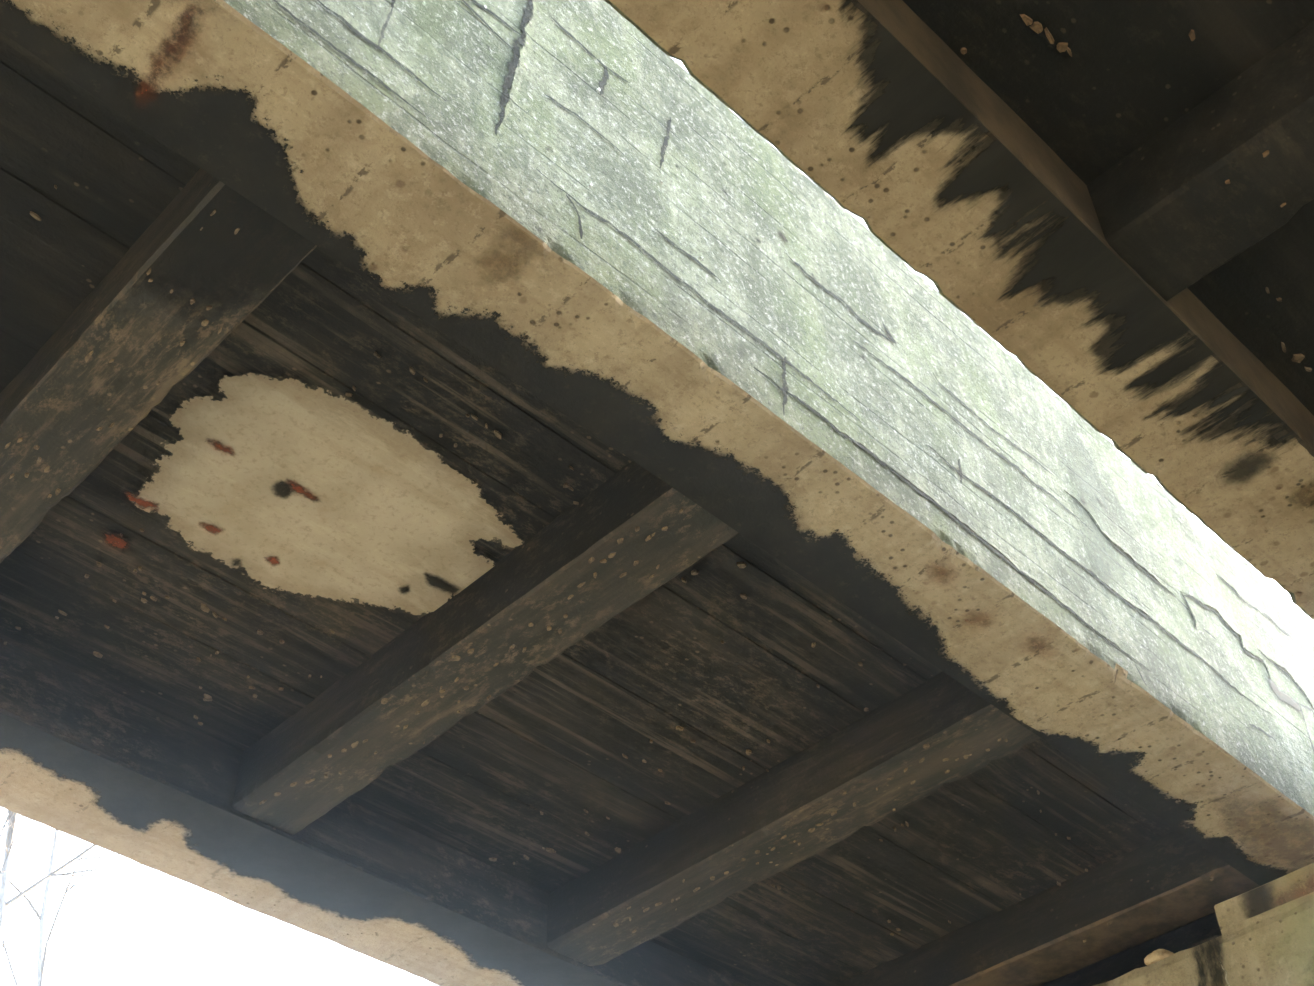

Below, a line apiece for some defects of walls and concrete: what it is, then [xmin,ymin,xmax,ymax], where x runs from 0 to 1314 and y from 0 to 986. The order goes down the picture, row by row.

corrosion [135,8,202,102]
crack [274,0,447,117]
crack [462,0,630,155]
crack [660,117,671,168]
peeling [126,372,525,615]
crack [537,169,1314,752]
damp [1226,453,1271,482]
damp [1194,934,1230,986]